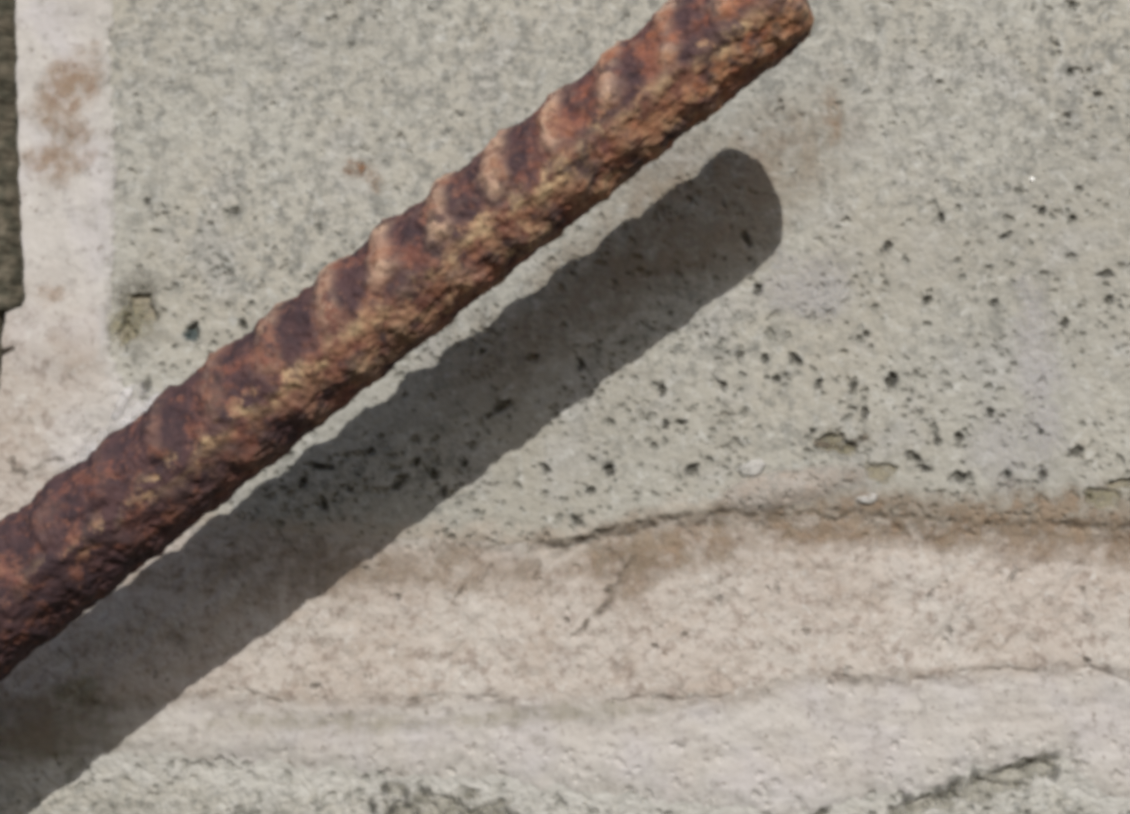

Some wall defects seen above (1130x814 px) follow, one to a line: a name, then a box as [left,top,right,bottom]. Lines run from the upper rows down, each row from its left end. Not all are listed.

corrosion [44,68,95,121]
water stain [588,521,733,594]
water stain [765,491,1130,560]